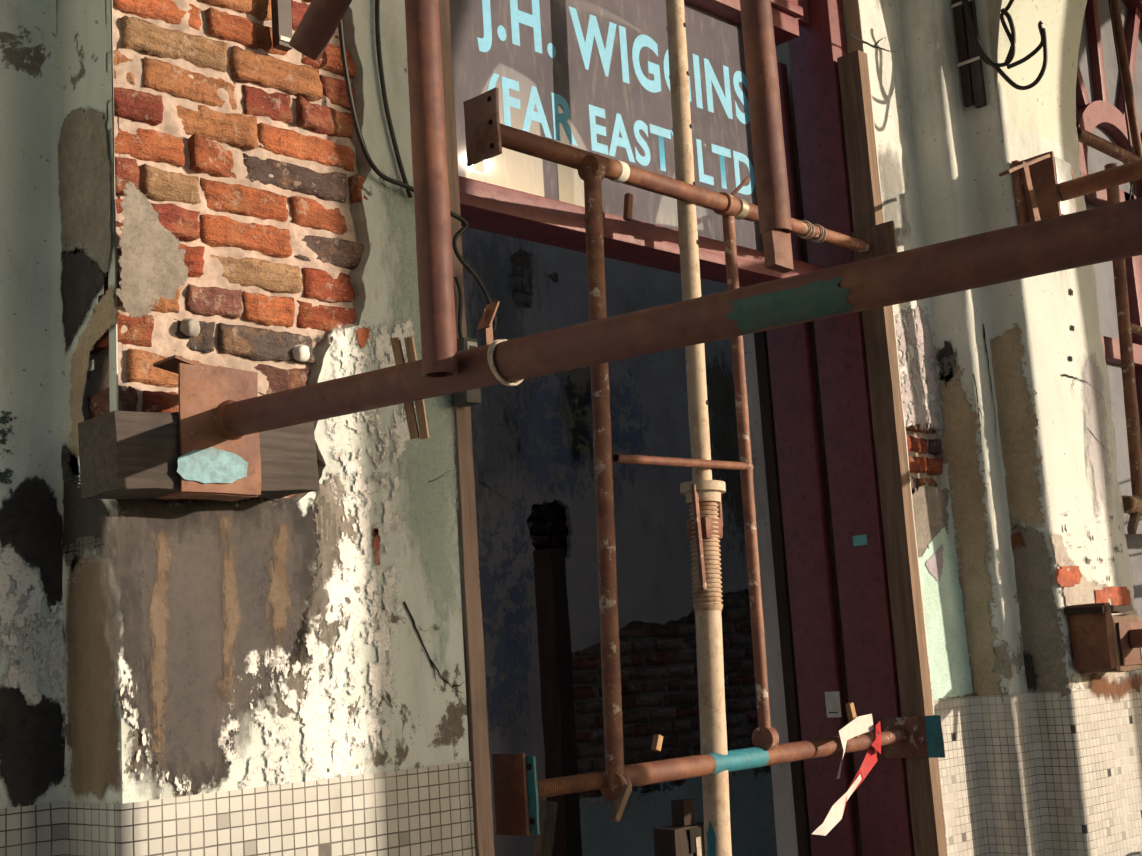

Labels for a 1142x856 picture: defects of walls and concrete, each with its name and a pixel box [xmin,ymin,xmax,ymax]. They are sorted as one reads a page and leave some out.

spalling [58,0,415,478]
flaking render [894,302,1003,702]
flaking render [990,324,1138,698]
peeling [0,544,65,706]
damp [0,443,327,807]
peeling [218,401,415,788]
spalling [572,641,606,775]
spalling [619,607,701,765]
spalling [721,590,758,751]
peeling [579,776,704,856]
peeling [728,765,777,856]